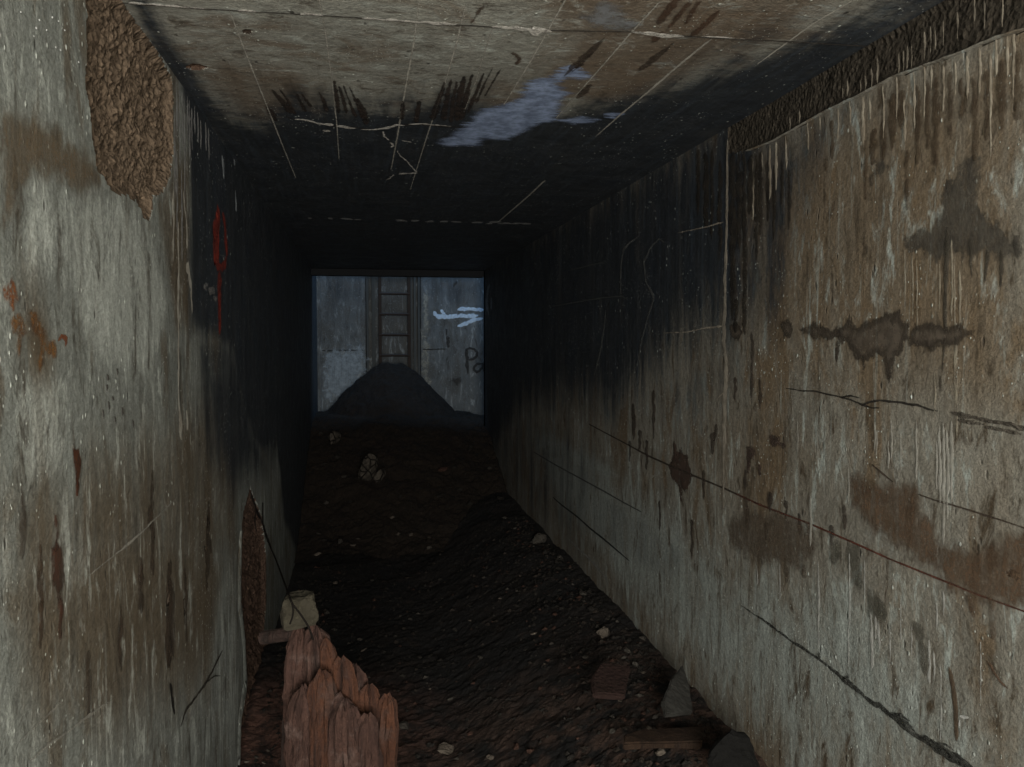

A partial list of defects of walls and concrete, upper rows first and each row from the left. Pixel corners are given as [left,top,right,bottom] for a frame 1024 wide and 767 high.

spalling [82,0,219,229]
spalling [724,0,1024,160]
corrosion [3,281,68,368]
leakage [628,390,656,470]
leakage [666,0,1024,740]
crack [786,388,1024,435]
spalling [237,485,268,767]
crack [742,606,973,767]